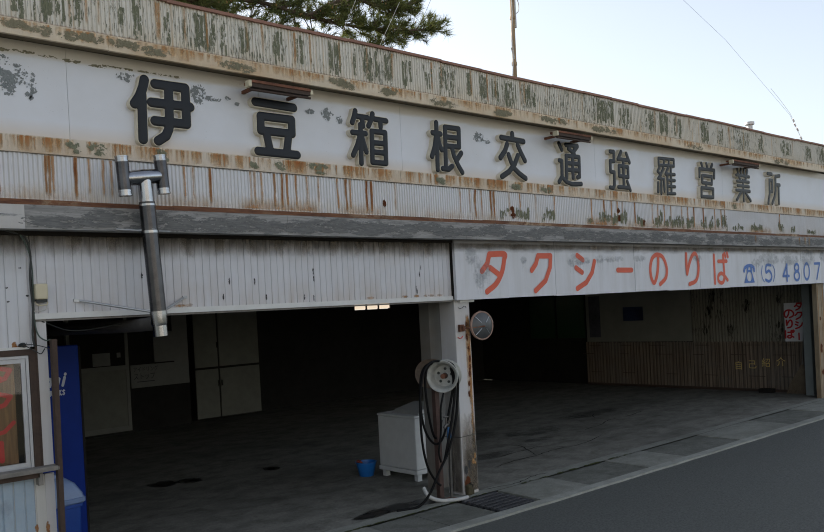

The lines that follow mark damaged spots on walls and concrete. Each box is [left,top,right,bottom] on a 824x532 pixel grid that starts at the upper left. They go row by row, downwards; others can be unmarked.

peeling [0,47,179,101]
peeling [190,84,240,106]
peeling [193,13,256,73]
peeling [273,31,285,65]
peeling [305,108,342,124]
peeling [328,41,412,96]
peeling [466,73,536,117]
corrosion [13,135,68,194]
corrosion [102,144,131,195]
peeling [156,212,329,235]
peeling [502,209,763,245]
corrosion [465,316,475,438]